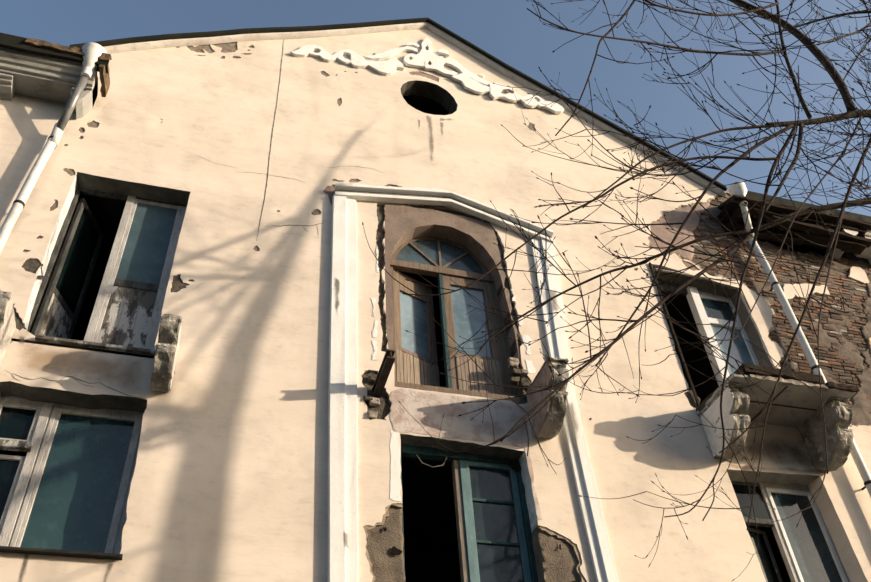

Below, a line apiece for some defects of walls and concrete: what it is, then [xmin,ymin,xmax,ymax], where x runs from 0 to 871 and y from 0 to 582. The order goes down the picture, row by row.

spalling [176,42,254,59]
crack [199,40,300,241]
spalling [21,250,45,280]
spalling [171,275,194,292]
flaking render [370,298,378,360]
flaking render [634,191,871,427]
crack [12,373,146,399]
spalling [361,371,391,420]
spalling [363,431,405,582]
spalling [525,449,586,582]